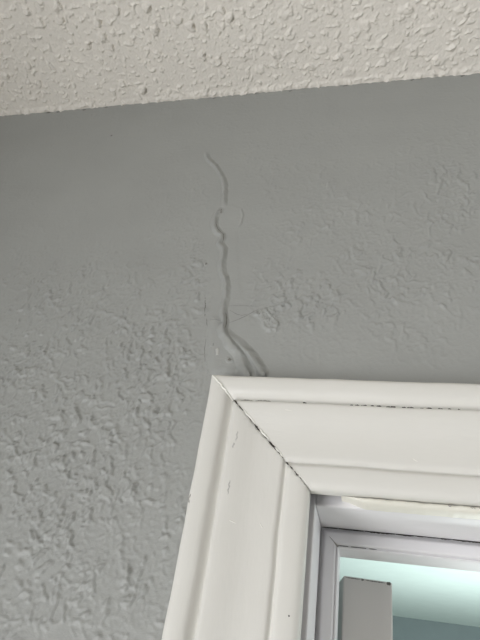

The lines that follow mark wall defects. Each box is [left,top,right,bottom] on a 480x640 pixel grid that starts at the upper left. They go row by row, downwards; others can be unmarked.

crack [203,148,308,488]